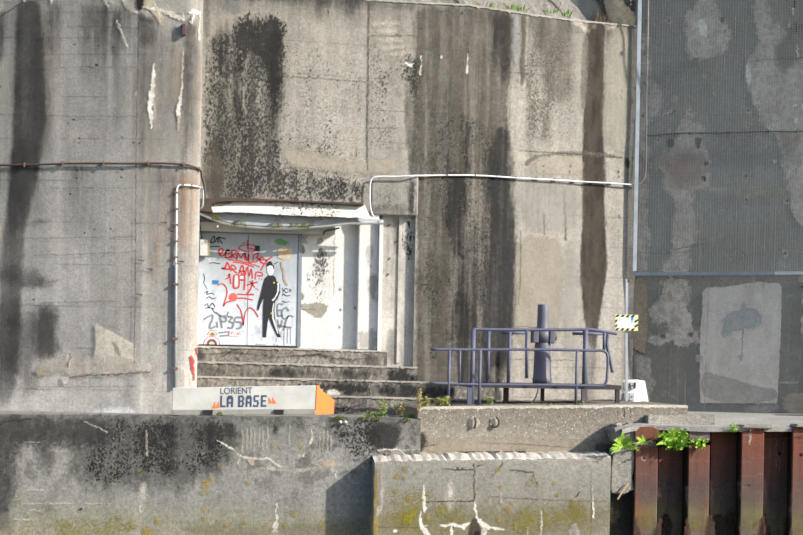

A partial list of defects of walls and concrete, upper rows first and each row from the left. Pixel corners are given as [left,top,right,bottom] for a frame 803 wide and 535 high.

peeling [682,0,732,63]
peeling [745,0,803,227]
water stain [0,0,60,386]
water stain [105,0,631,412]
peeling [604,0,712,402]
water stain [0,407,337,512]
water stain [299,417,405,468]
crack [426,465,480,503]
rust [654,513,673,535]
rust [706,511,741,535]
rust [754,513,771,535]